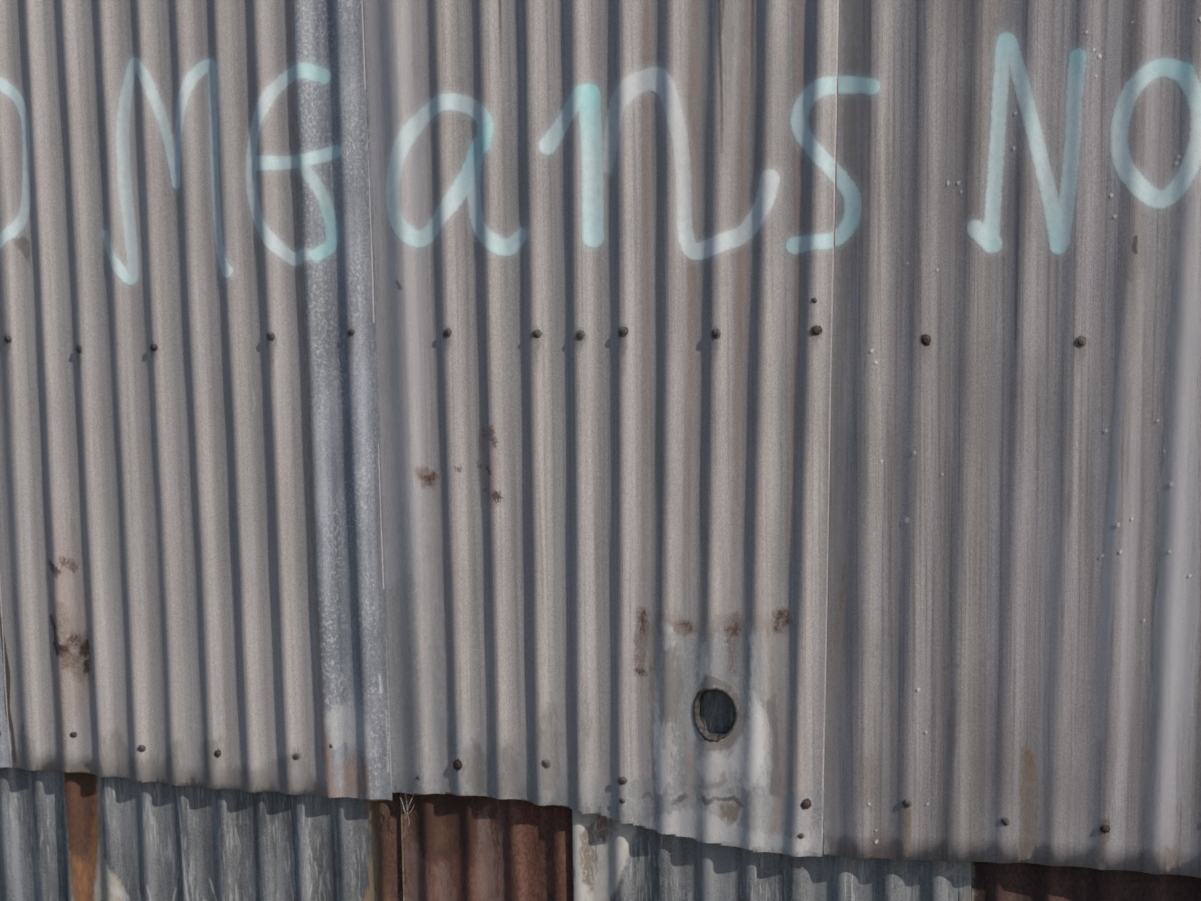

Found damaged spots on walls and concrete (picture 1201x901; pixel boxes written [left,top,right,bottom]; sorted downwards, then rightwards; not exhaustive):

rust [416,466,438,487]
rust [49,557,78,578]
rust [50,603,90,681]
rust [635,609,653,677]
rust [772,610,790,632]
rust [60,720,125,901]
rust [325,755,486,901]